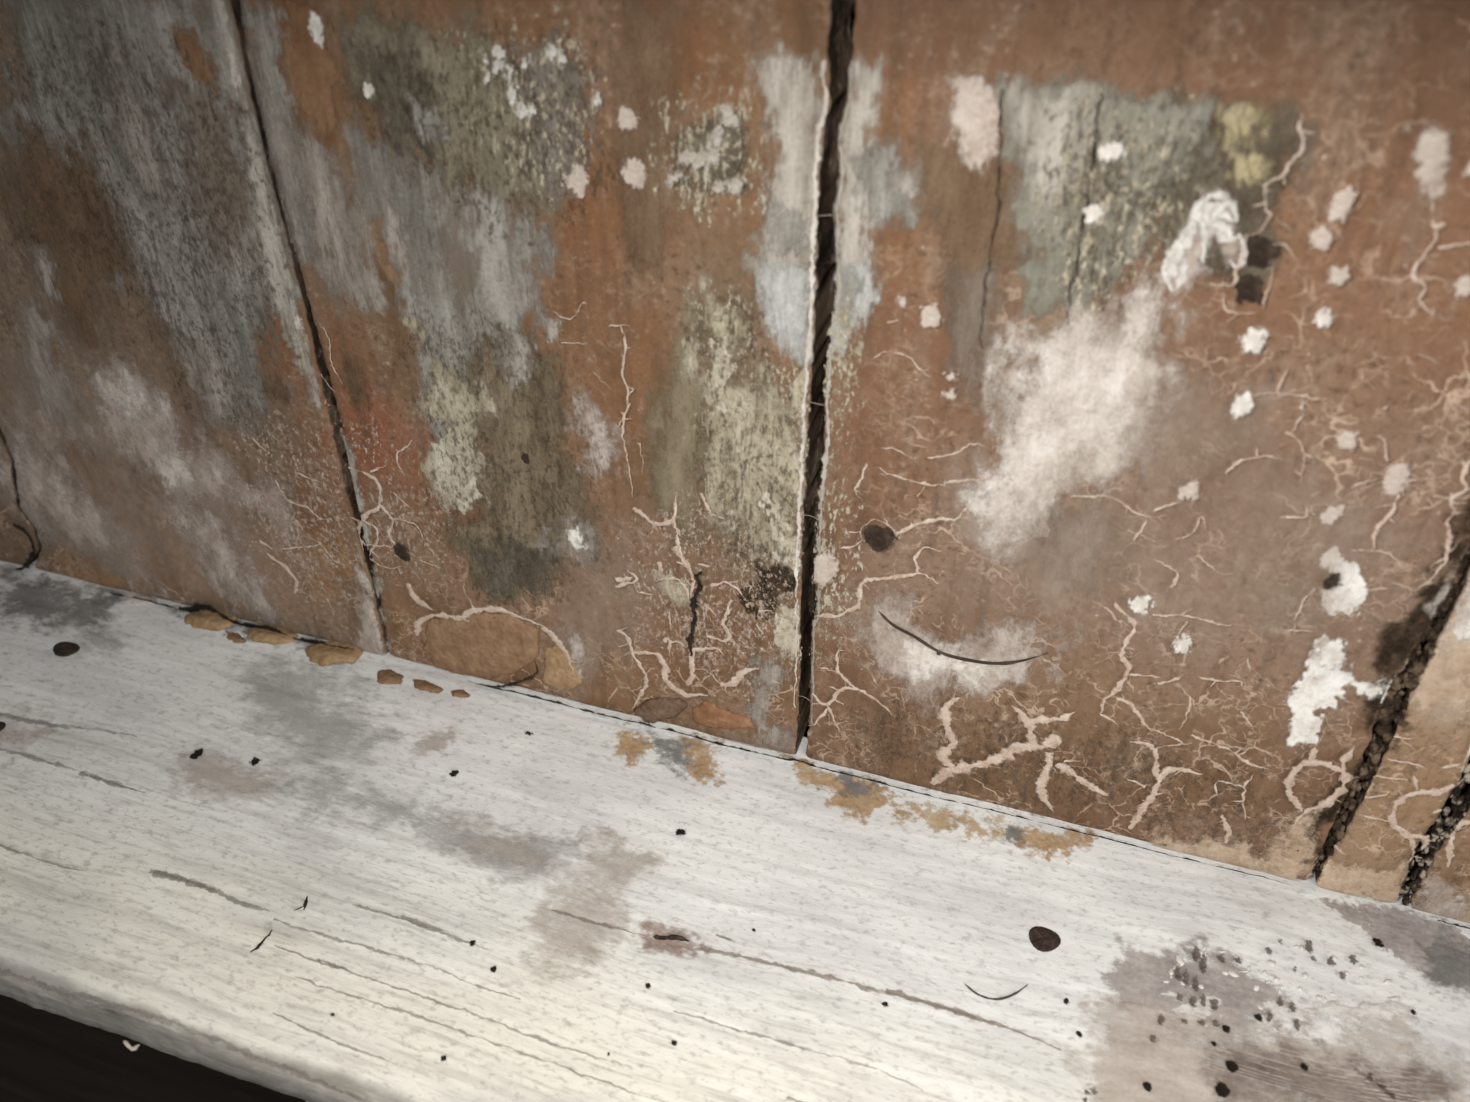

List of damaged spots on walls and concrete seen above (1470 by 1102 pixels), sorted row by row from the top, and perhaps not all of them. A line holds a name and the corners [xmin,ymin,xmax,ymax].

leakage [0,0,600,646]
leakage [609,0,747,271]
crack [110,302,1470,886]
leakage [643,43,1318,666]
crack [1400,202,1470,321]
leakage [1081,997,1467,1102]